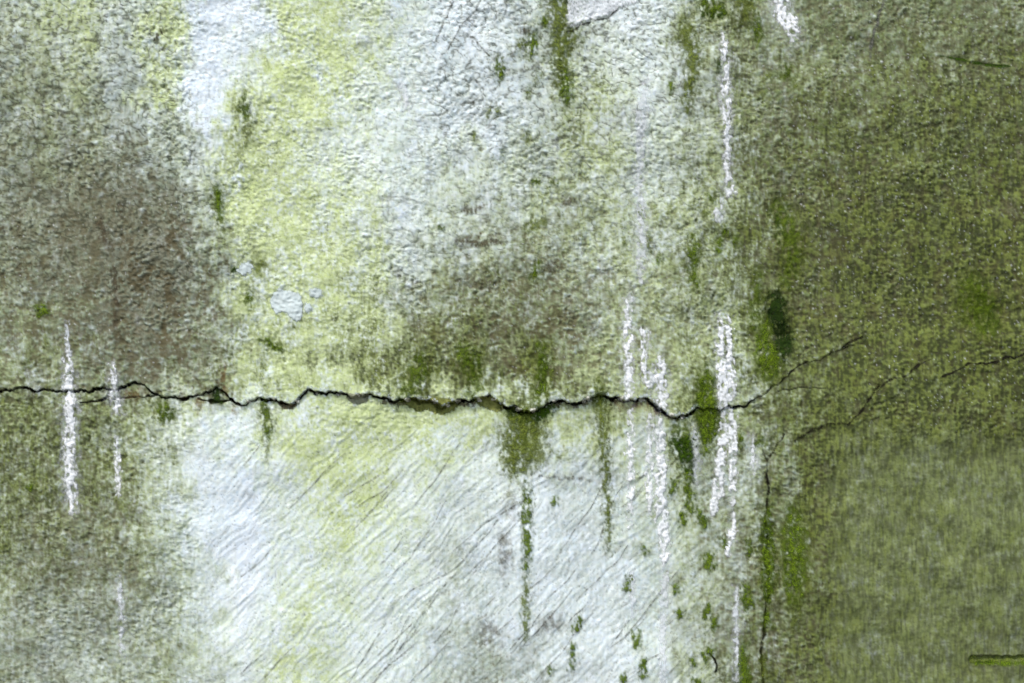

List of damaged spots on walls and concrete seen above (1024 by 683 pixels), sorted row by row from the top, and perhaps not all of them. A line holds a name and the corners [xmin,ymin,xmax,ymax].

leakage [752,17,764,45]
efflorescence [773,0,800,42]
leakage [636,87,664,283]
leakage [701,33,739,253]
efflorescence [61,325,78,513]
efflorescence [109,363,121,413]
crack [0,337,862,420]
leakage [505,450,533,640]
leakage [623,297,696,683]
efflorescence [710,313,738,556]
leakage [749,273,784,381]
crack [759,353,1024,683]